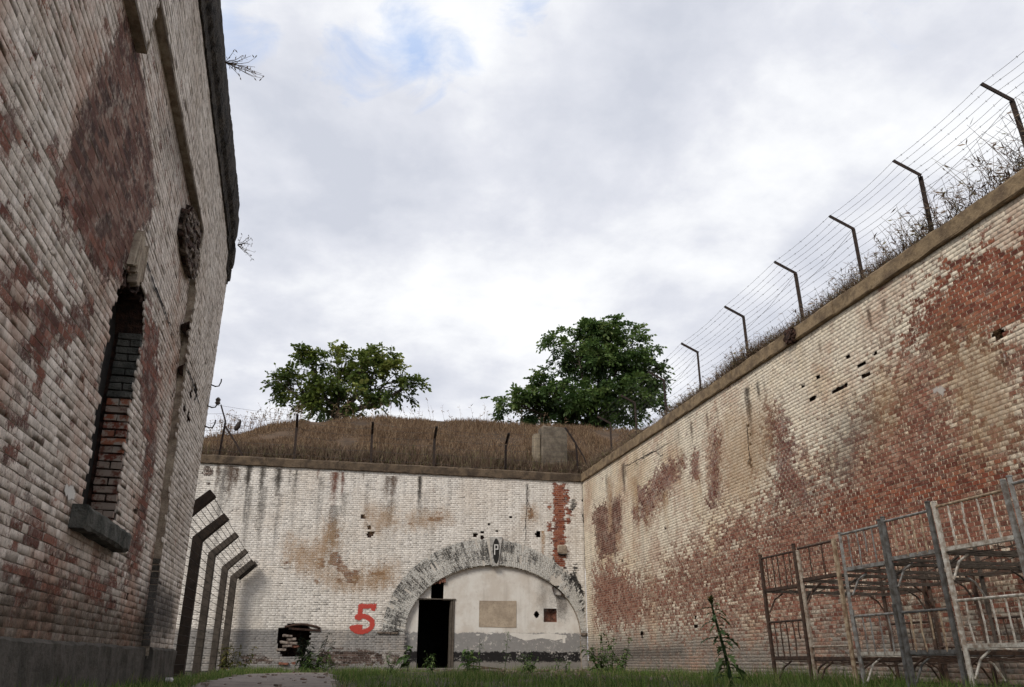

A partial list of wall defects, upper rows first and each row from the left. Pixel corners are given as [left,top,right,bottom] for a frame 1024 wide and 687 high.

peeling [0,7,165,623]
leakage [216,464,297,526]
peeling [547,217,1024,665]